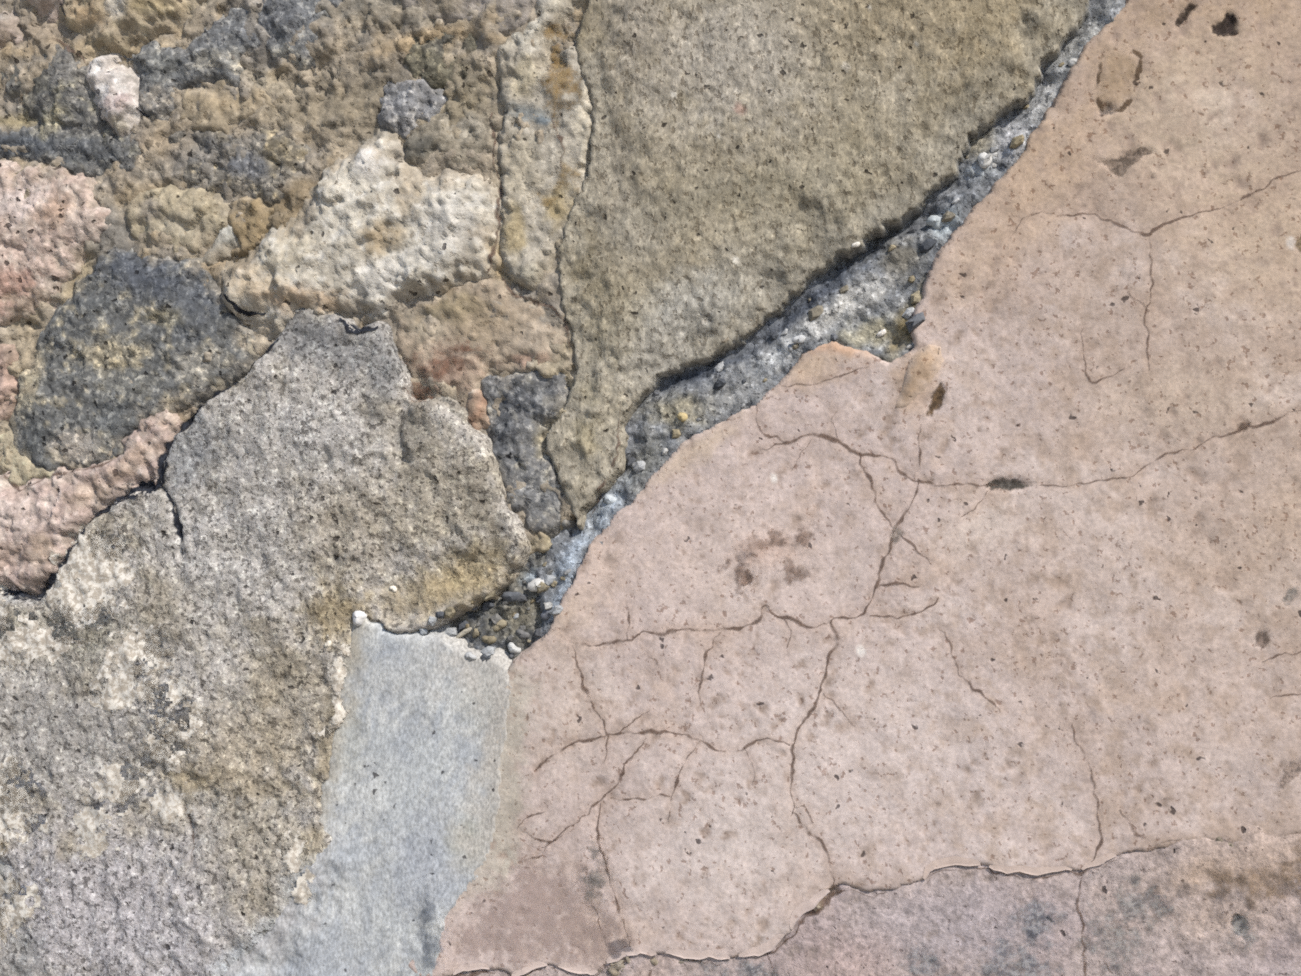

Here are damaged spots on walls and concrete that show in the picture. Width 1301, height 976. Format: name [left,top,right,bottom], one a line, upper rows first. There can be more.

crack [339,318,378,335]
crack [487,112,570,349]
crack [1013,171,1297,383]
crack [0,294,279,602]
crack [1040,410,1300,487]
crack [517,403,1001,946]
peeling [453,825,1301,976]
crack [1072,724,1183,976]
peeling [1257,631,1270,647]
peeling [1280,762,1301,788]